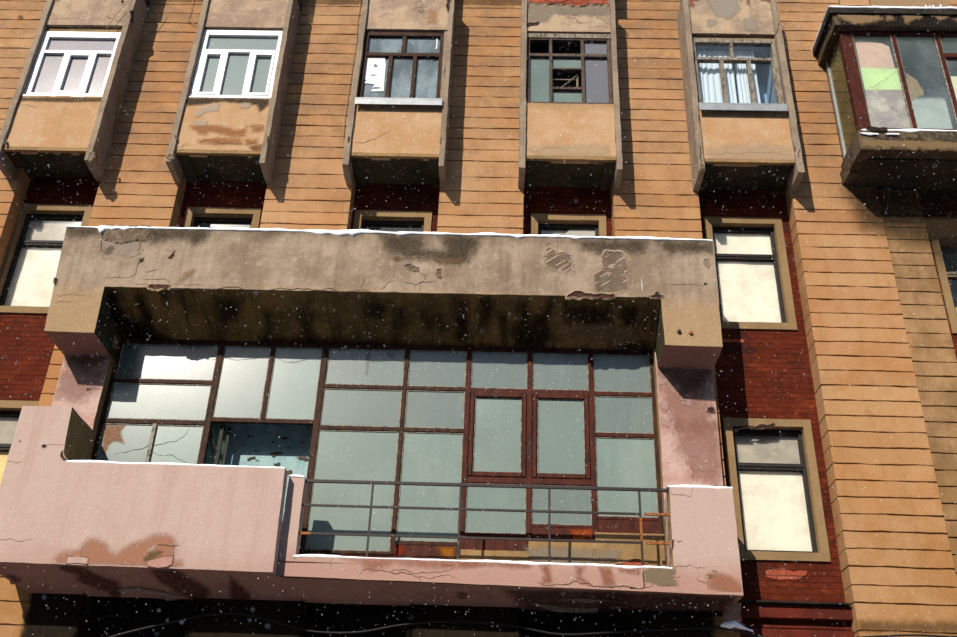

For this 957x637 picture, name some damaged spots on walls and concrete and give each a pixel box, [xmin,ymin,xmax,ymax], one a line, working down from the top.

peeling [195,104,219,126]
crack [105,244,434,293]
peeling [565,249,632,300]
leakage [216,298,239,325]
leakage [434,301,550,348]
leakage [565,304,648,351]
leakage [661,369,710,394]
corrosion [571,529,592,540]
peeling [66,555,89,565]
peeling [146,555,174,568]
corrosion [440,548,454,560]